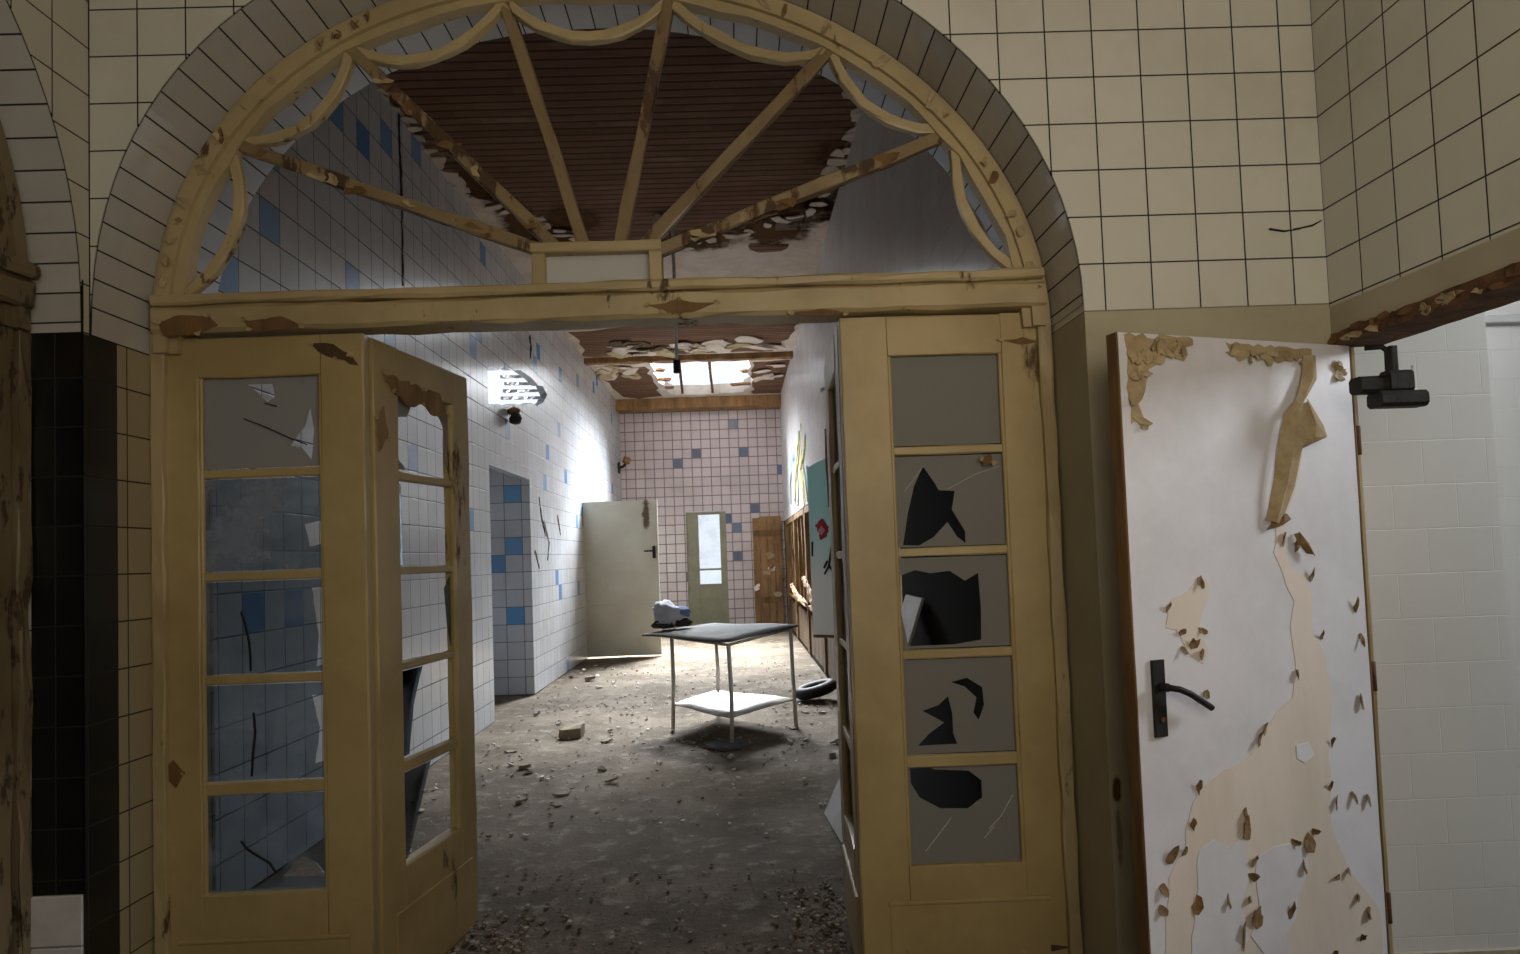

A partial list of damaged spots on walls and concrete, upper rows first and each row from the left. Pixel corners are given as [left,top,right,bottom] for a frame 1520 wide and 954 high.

peeling [306,170,367,194]
flaking render [372,28,861,253]
flaking render [568,300,849,399]
peeling [1158,448,1383,954]